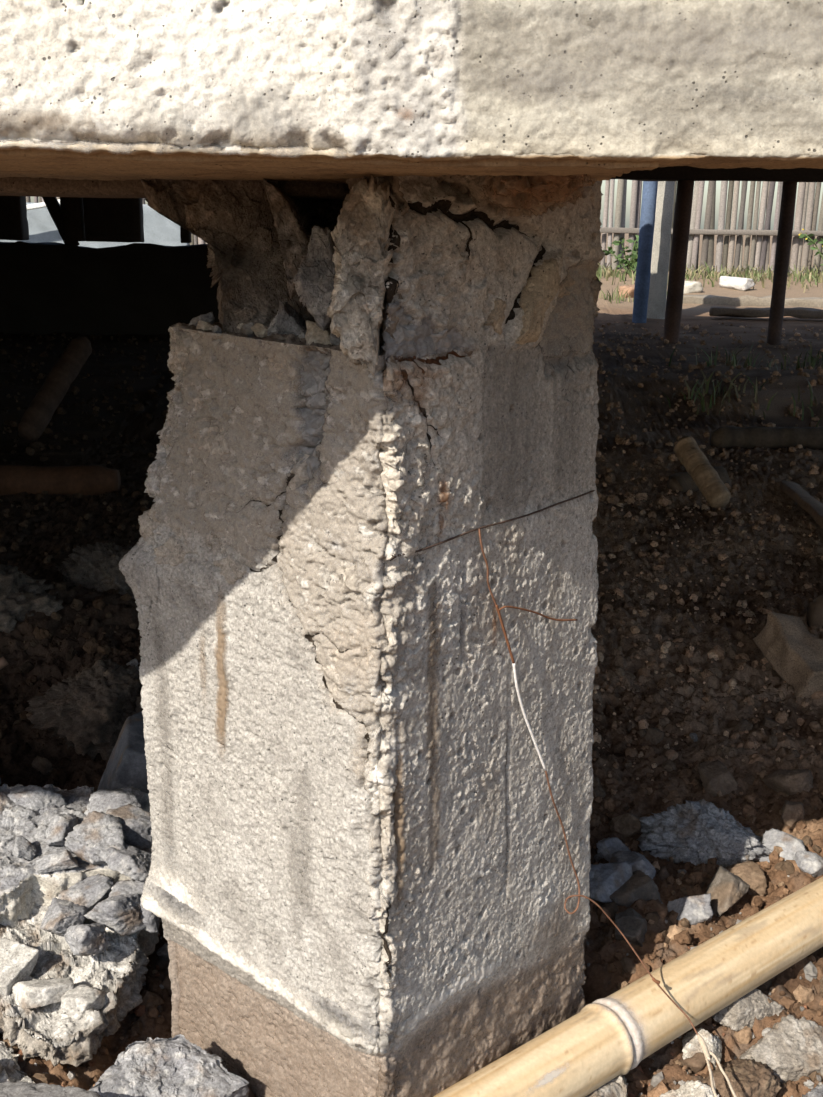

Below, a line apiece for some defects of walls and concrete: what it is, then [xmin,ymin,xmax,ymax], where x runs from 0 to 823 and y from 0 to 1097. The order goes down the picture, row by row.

crack [385,196,546,324]
peeling [483,258,599,358]
crack [385,350,466,465]
spalling [138,302,474,790]
leakage [369,541,397,595]
crack [236,474,370,791]
spalling [371,806,382,848]
leakage [141,870,494,1055]
crack [380,886,392,988]